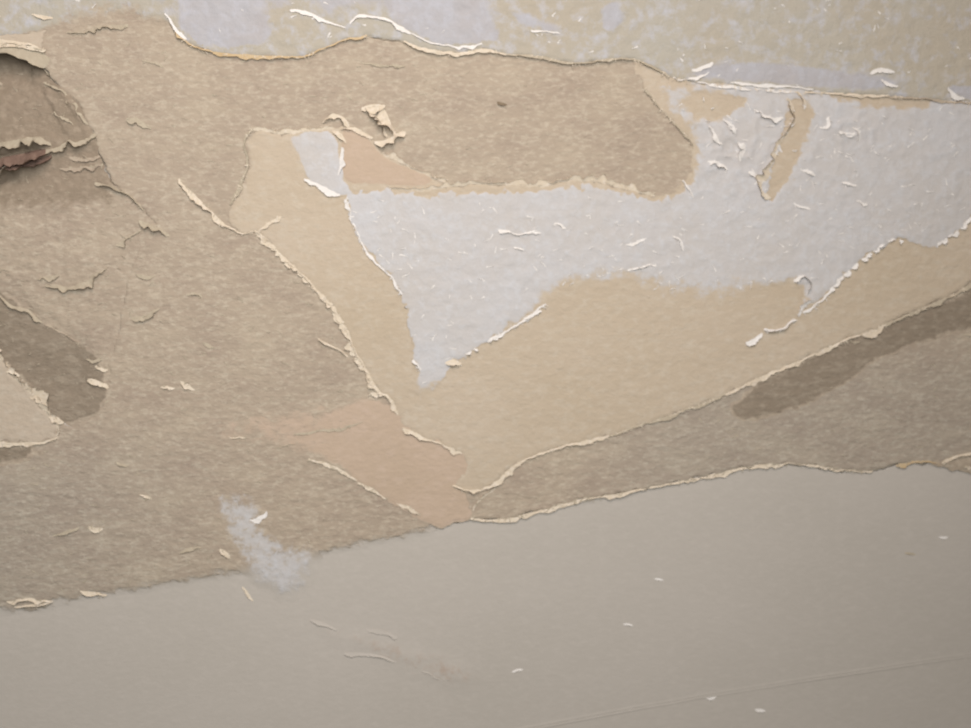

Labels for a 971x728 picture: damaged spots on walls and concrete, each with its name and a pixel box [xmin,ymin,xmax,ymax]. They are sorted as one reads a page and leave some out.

peeling [688,62,713,81]
peeling [870,68,898,87]
peeling [748,98,795,200]
spalling [0,43,156,428]
peeling [830,239,904,292]
peeling [937,217,971,246]
peeling [746,275,815,346]
damp [730,288,971,421]